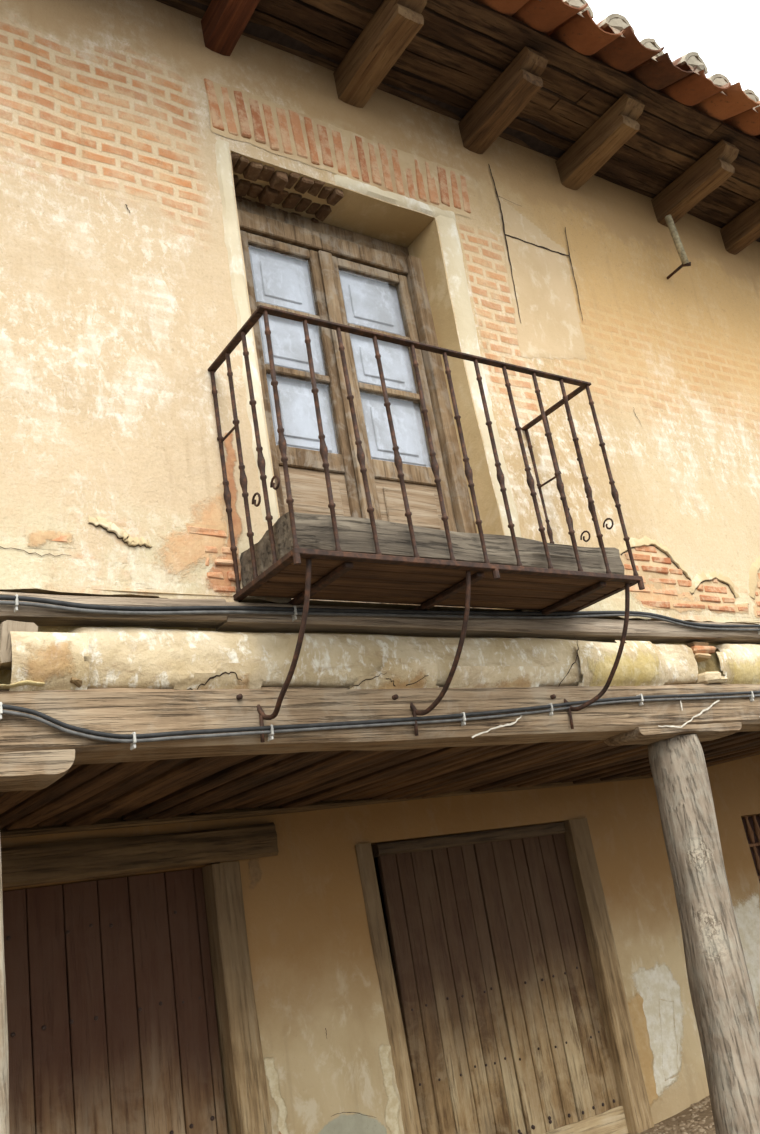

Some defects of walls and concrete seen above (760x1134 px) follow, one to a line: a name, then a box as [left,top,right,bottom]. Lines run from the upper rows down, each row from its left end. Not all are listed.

flaking render [25,528,77,550]
crack [88,514,152,548]
flaking render [186,523,227,538]
flaking render [618,536,760,621]
peeling [625,955,691,1098]
flaking render [263,1051,290,1134]
flaking render [375,1040,403,1134]